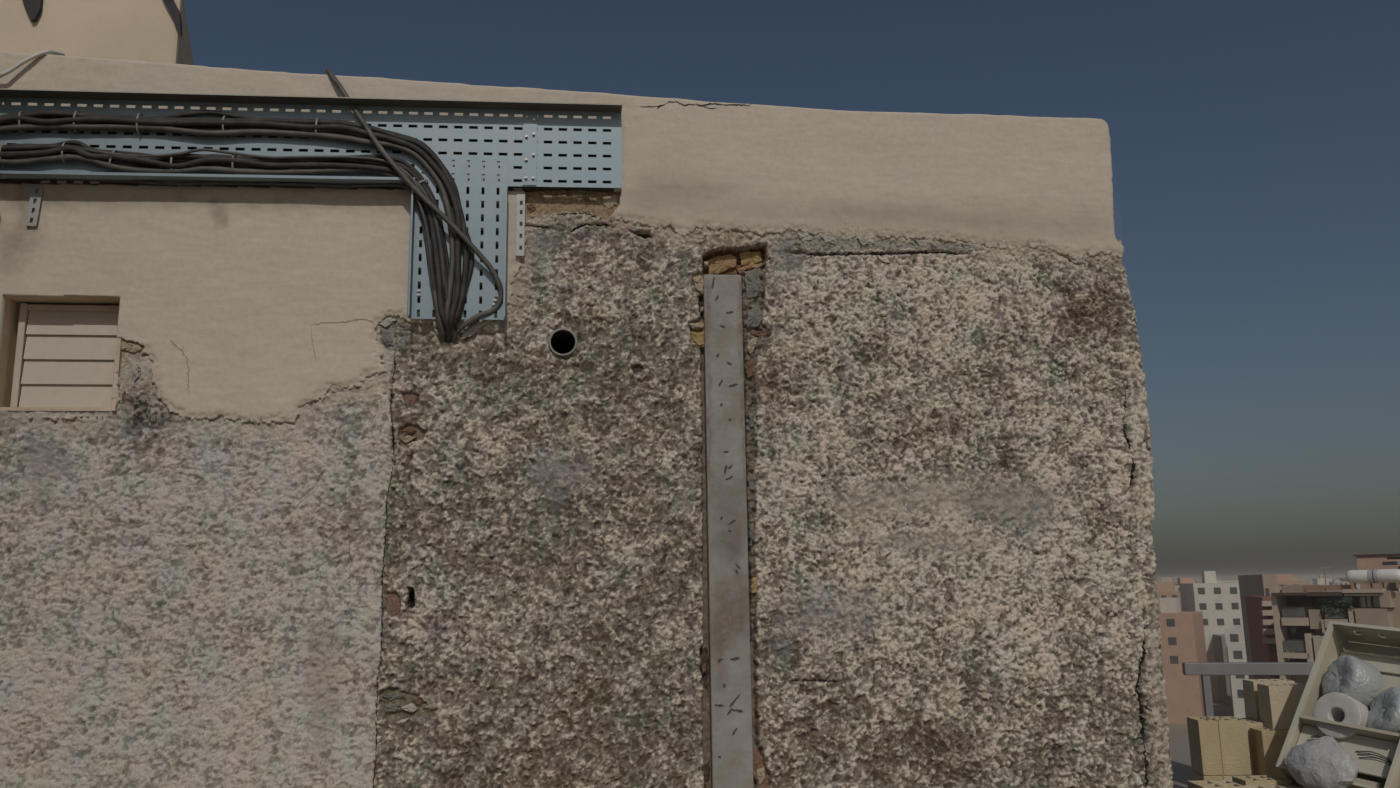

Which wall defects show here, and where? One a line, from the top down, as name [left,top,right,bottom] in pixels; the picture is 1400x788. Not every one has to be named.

crack [640,101,752,109]
spalling [524,189,620,220]
crack [785,250,968,264]
spalling [119,339,145,401]
spalling [398,424,426,448]
spalling [688,232,984,629]
crack [1120,397,1144,488]
crack [1132,628,1152,788]